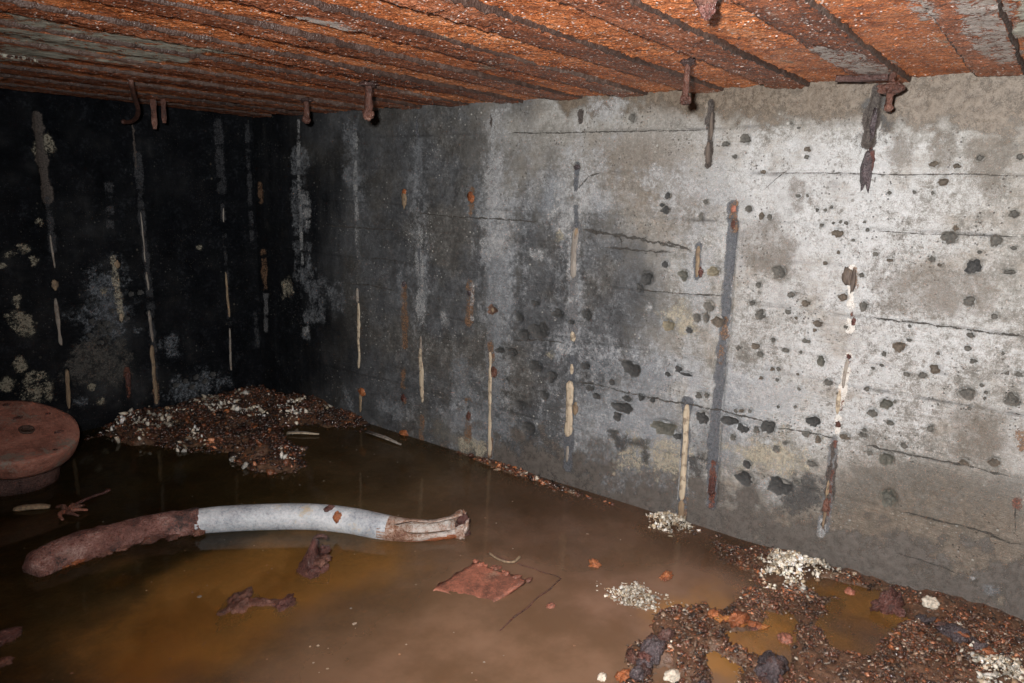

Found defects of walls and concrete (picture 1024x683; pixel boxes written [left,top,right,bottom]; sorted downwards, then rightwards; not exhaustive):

damp [33,134,56,154]
damp [548,139,609,242]
crack [766,171,1023,188]
crack [584,229,690,253]
damp [59,257,139,389]
damp [158,334,178,356]
damp [163,371,232,402]
crack [580,381,833,438]
rust [708,460,717,509]
rust [817,436,838,537]